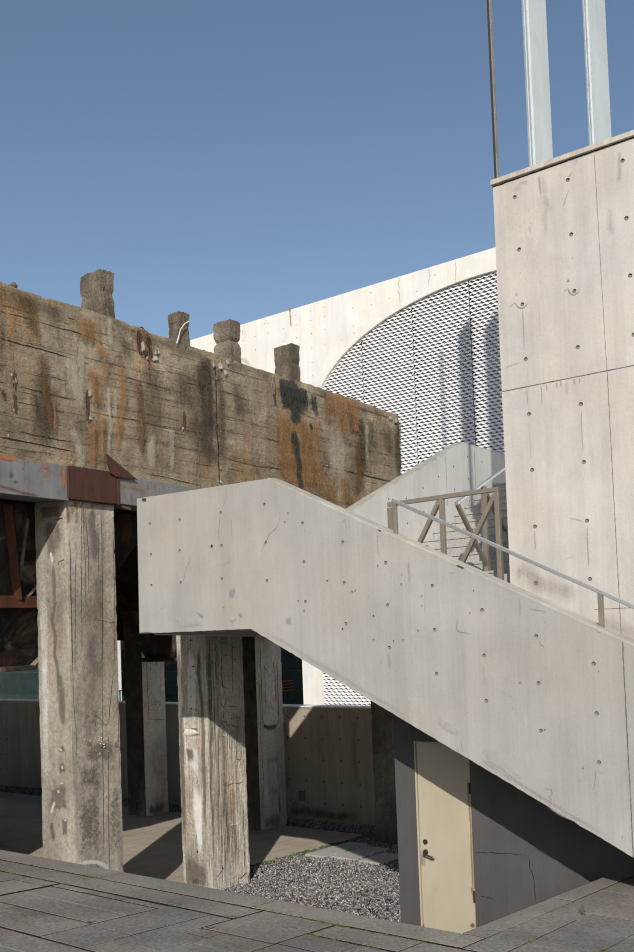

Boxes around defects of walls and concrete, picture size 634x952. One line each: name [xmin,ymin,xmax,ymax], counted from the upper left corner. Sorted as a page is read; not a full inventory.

corrosion [0,455,46,495]
corrosion [116,360,144,448]
damp [201,359,221,456]
corrosion [278,414,319,491]
corrosion [326,392,363,503]
crack [474,852,536,902]